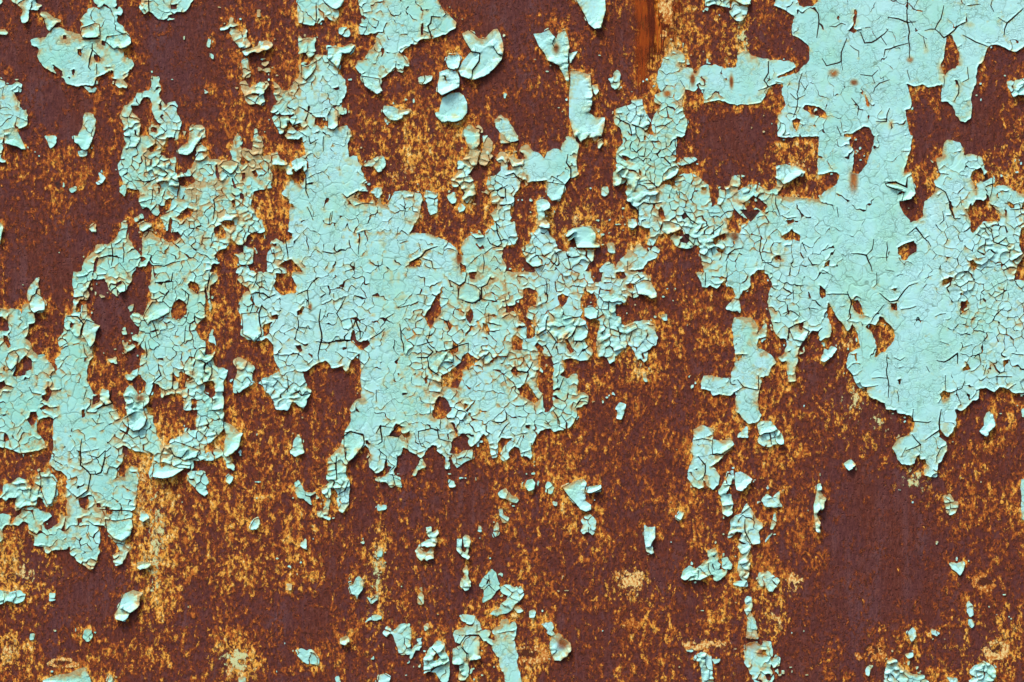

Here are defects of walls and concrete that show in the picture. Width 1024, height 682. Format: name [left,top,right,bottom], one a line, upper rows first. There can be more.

peeling [0,0,134,92]
crack [815,0,1023,135]
peeling [0,17,660,569]
crack [250,239,469,375]
crack [410,172,589,384]
peeling [613,0,1024,477]
crack [783,186,1023,460]
rust [219,648,250,678]
peeling [348,479,601,682]
rust [615,570,655,602]
rust [682,639,726,653]
rust [982,639,1010,665]